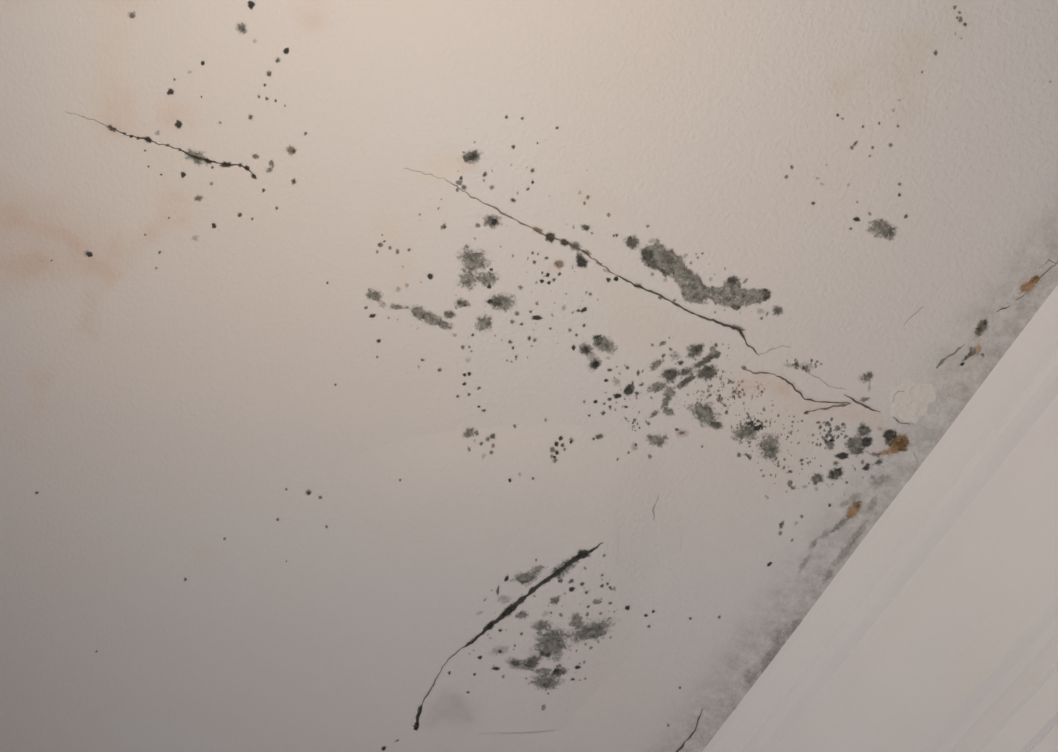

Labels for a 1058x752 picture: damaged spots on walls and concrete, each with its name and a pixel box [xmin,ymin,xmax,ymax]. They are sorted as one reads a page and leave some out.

crack [108,126,257,179]
water stain [463,150,479,162]
water stain [391,245,552,349]
water stain [576,253,602,267]
water stain [568,307,616,382]
crack [375,159,879,435]
water stain [613,234,782,320]
water stain [583,342,721,458]
water stain [687,393,882,489]
corrosion [872,430,908,456]
crack [382,543,602,751]
water stain [492,579,612,710]